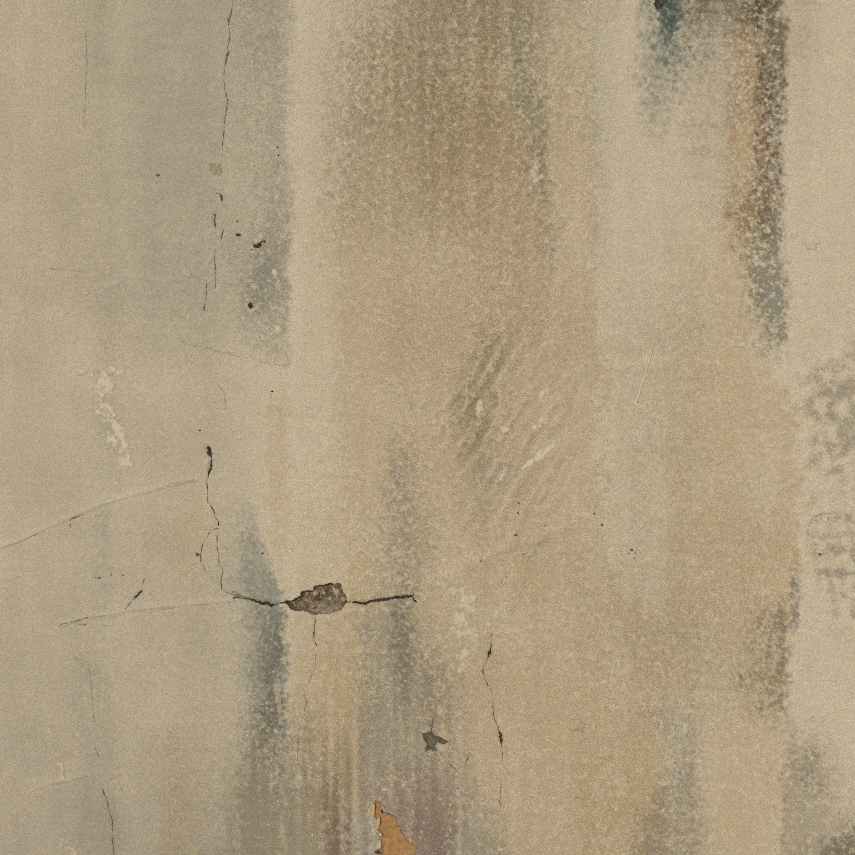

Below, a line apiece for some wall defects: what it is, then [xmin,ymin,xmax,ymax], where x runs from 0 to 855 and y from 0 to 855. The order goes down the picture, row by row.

leakage [756,1,787,54]
crack [222,4,233,154]
crack [157,446,289,614]
flaking render [287,583,347,615]
crack [345,593,417,605]
crack [482,634,503,755]
flaking render [422,731,448,752]
peeling [367,801,416,855]